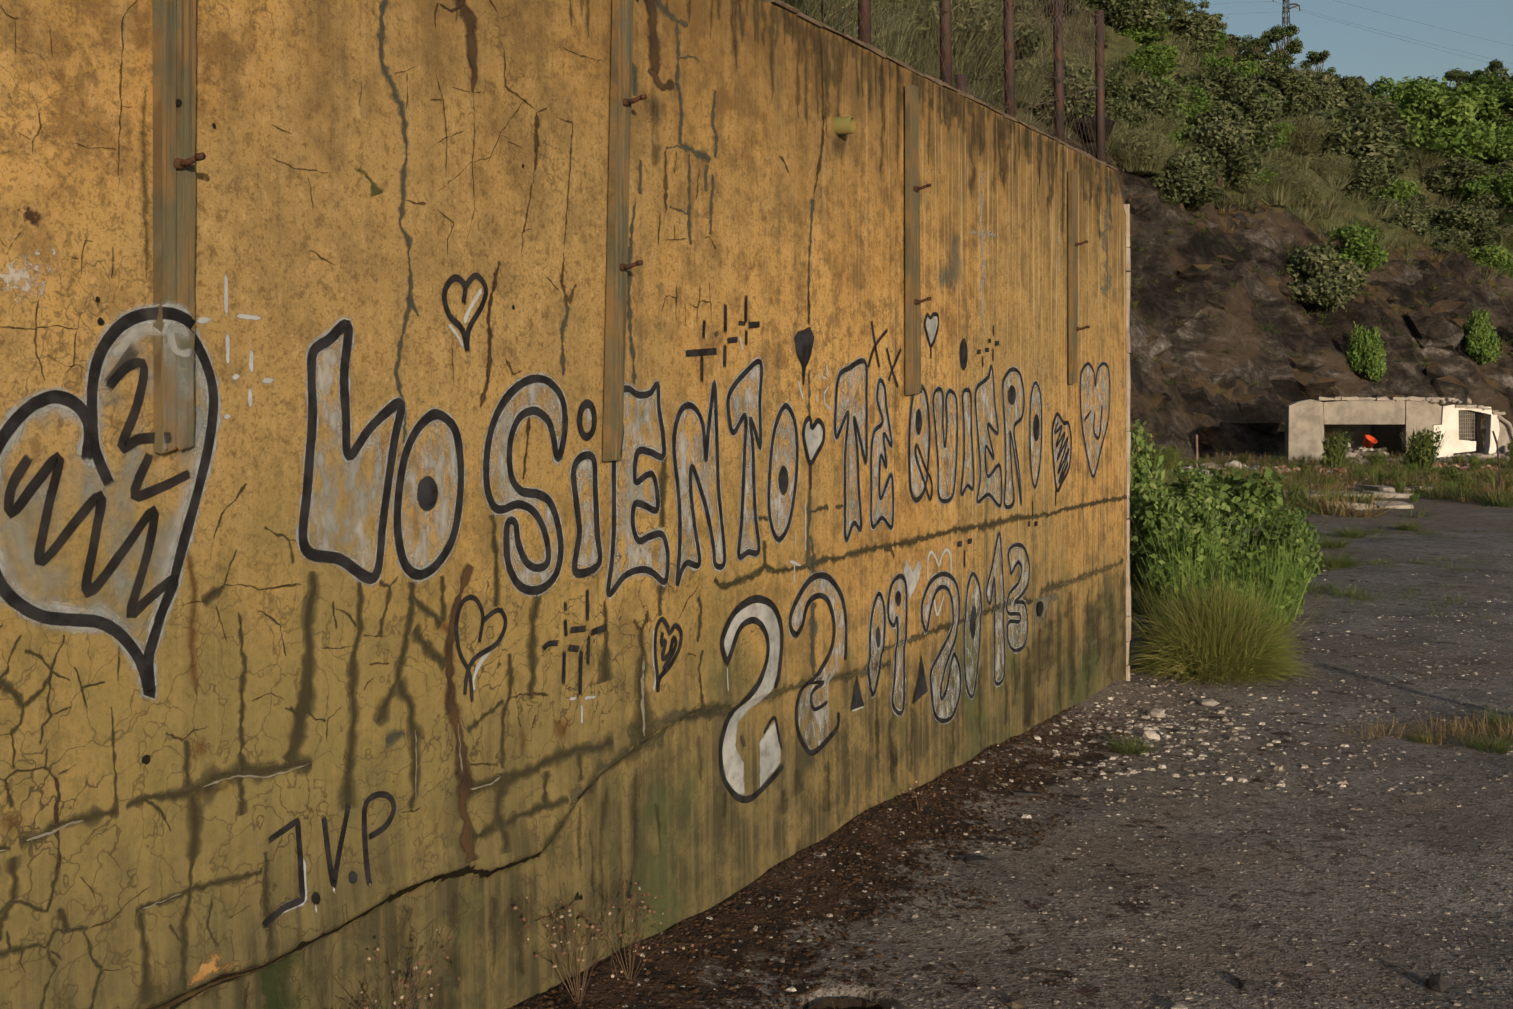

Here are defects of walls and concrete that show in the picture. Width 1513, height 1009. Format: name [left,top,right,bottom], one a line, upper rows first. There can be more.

peeling [0,248,56,300]
crack [271,124,328,205]
crack [359,0,577,480]
water stain [632,63,657,122]
crack [627,0,718,385]
crack [779,10,825,324]
crack [805,370,813,416]
water stain [711,0,1117,322]
crack [0,457,1127,1009]
water stain [1005,570,1126,727]